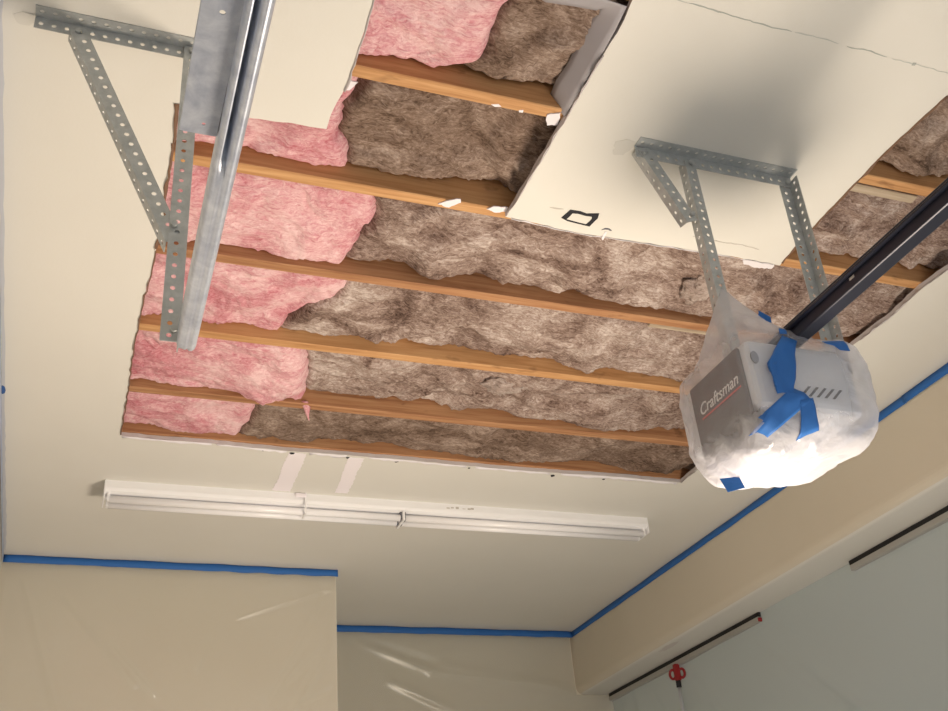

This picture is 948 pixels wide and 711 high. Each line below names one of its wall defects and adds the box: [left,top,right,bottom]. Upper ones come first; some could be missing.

crack [678,0,948,74]